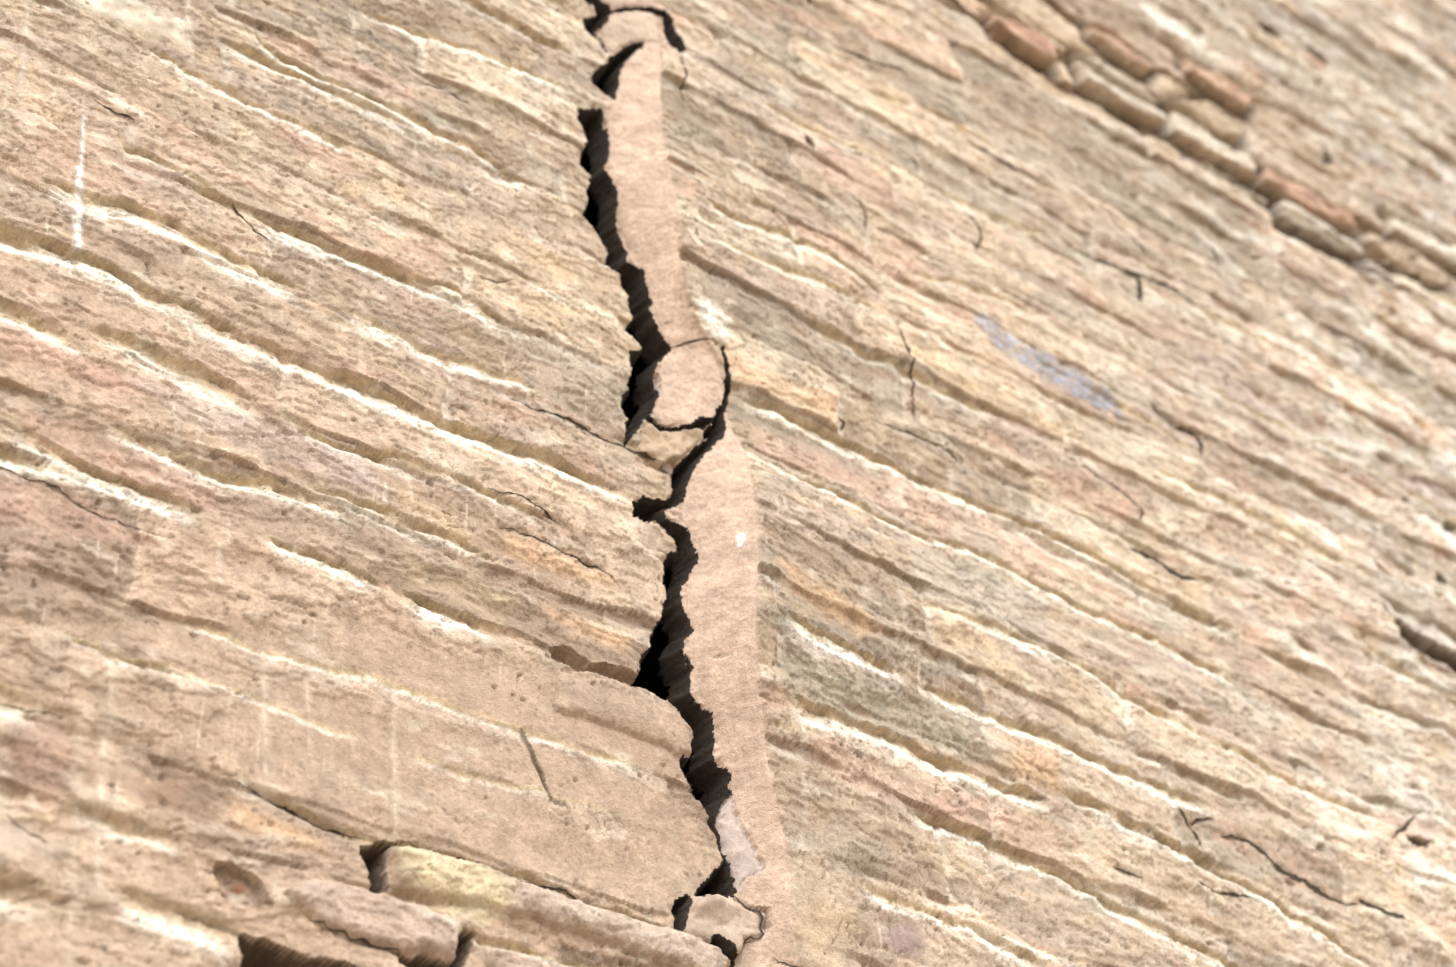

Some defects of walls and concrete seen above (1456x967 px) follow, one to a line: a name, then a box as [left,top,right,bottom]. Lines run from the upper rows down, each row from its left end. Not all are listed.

crack [422,81,469,104]
spalling [950,0,1456,297]
crack [513,0,797,967]
crack [490,488,619,585]
spalling [212,860,278,907]
crack [228,778,481,864]
crack [1178,807,1406,919]
crack [309,919,400,951]